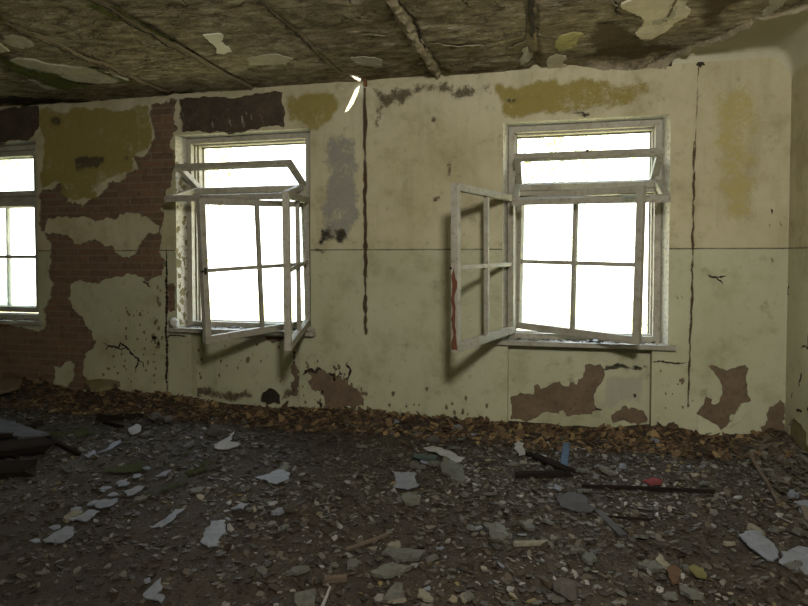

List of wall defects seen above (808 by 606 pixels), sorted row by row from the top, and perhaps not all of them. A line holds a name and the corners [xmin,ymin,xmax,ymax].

crack [0,21,172,93]
crack [90,0,253,89]
crack [258,0,341,74]
crack [357,0,568,78]
peeling [621,0,691,40]
spalling [0,91,285,392]
crack [104,342,144,372]
crack [143,252,186,390]
spalling [262,380,281,405]
spalling [291,351,368,409]
spalling [510,364,647,425]
spalling [696,365,751,435]